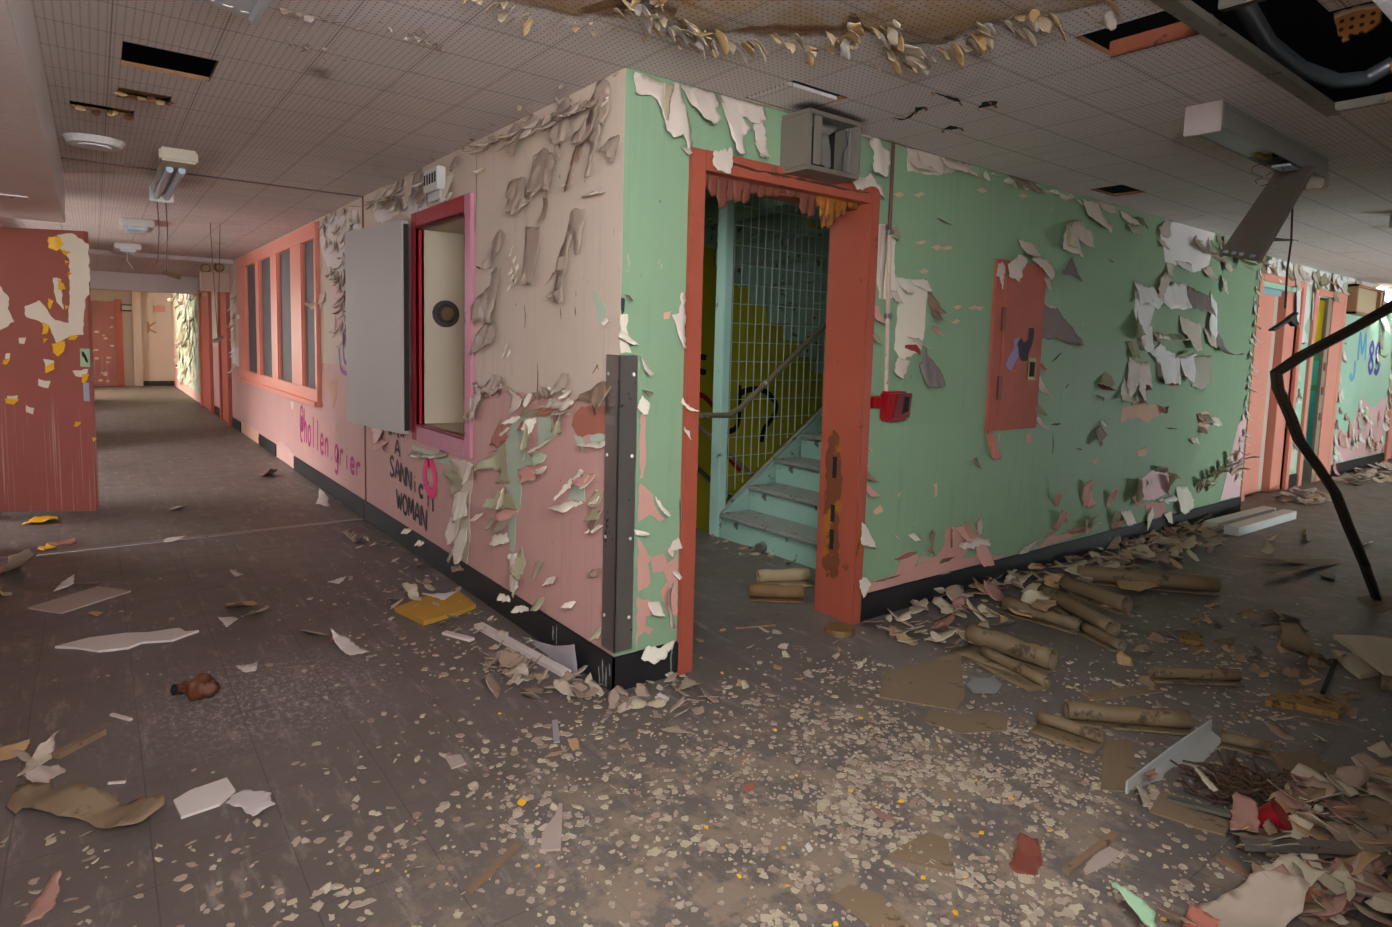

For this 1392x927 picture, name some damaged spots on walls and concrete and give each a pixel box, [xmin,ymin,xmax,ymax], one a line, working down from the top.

leakage [508,0,1106,45]
peeling [1084,0,1121,31]
peeling [107,91,175,121]
peeling [0,233,90,388]
peeling [304,72,770,664]
peeling [5,395,34,414]
peeling [852,134,1392,648]